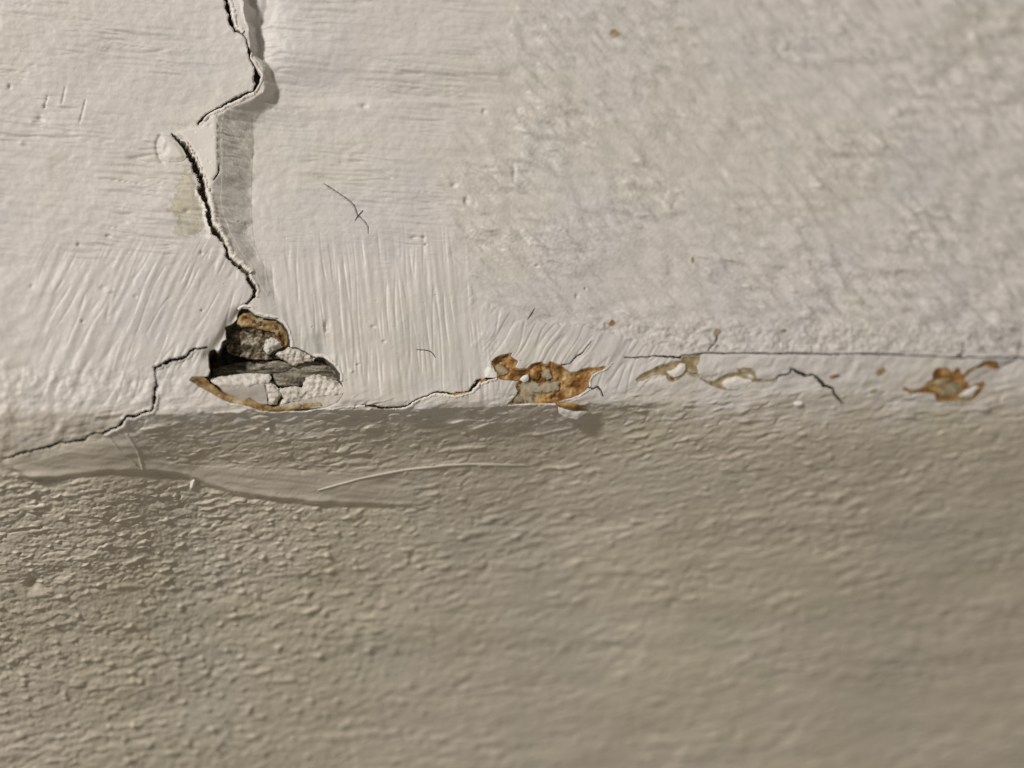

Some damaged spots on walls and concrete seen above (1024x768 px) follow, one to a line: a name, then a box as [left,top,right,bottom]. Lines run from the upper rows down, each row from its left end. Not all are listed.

crack [171,0,266,311]
crack [3,346,207,460]
spalling [190,304,365,414]
crack [363,377,497,412]
peeling [478,353,613,420]
peeling [636,354,777,390]
crack [624,335,1024,405]